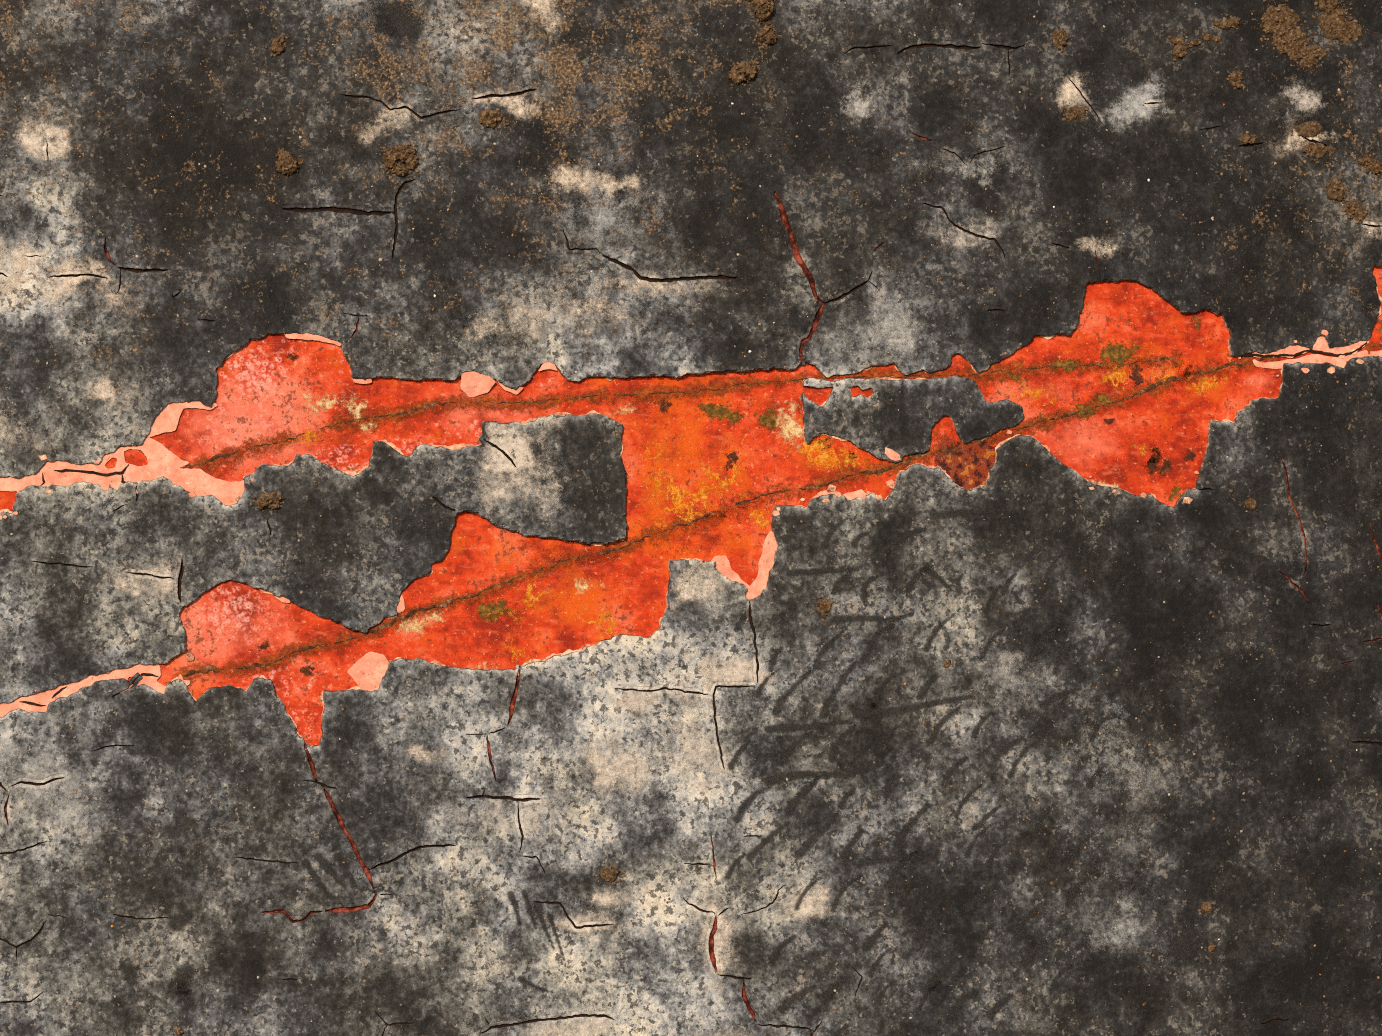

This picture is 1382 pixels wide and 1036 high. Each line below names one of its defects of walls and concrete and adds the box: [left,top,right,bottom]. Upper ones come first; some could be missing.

crack [339,86,539,122]
crack [282,177,419,261]
crack [560,227,740,286]
crack [771,190,887,366]
crack [921,200,1008,262]
peeling [0,267,1382,750]
crack [612,599,762,772]
crack [0,774,66,858]
crack [260,744,458,926]
crack [464,664,616,932]
crack [681,832,823,1036]
crack [478,1011,618,1036]